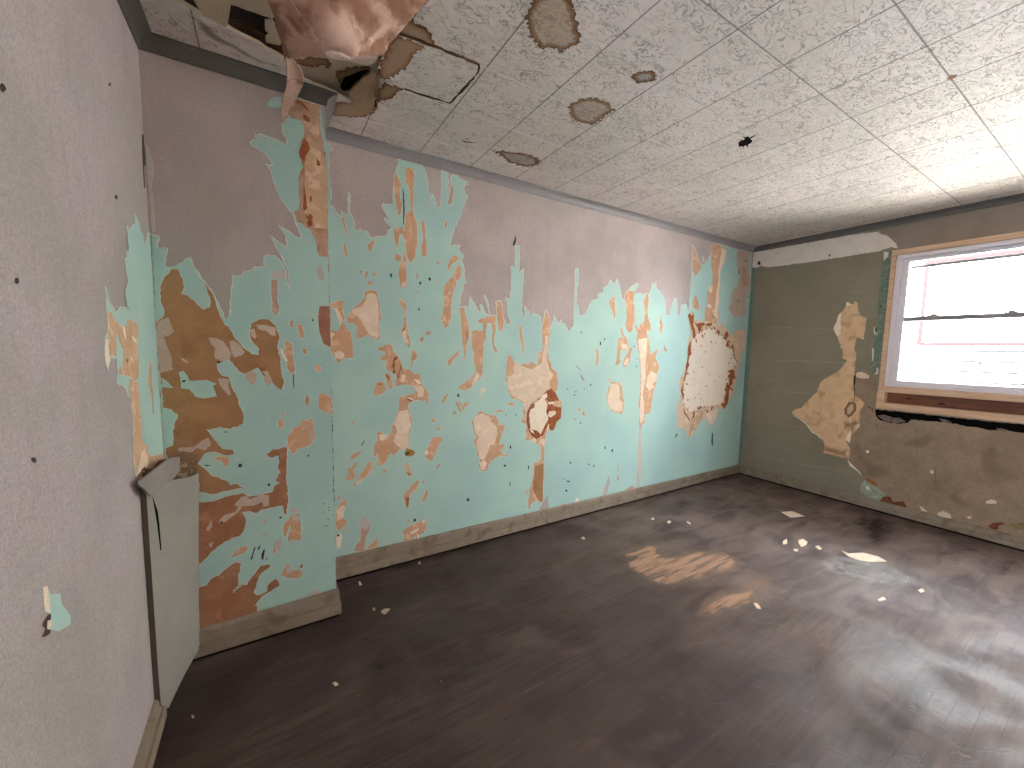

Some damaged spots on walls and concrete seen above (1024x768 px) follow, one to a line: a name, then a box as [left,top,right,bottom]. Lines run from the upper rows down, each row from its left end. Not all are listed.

leakage [524,0,582,53]
leakage [294,18,435,118]
leakage [631,70,656,84]
leakage [567,97,615,125]
leakage [493,150,541,167]
peeling [104,97,898,628]
spalling [792,301,1024,538]